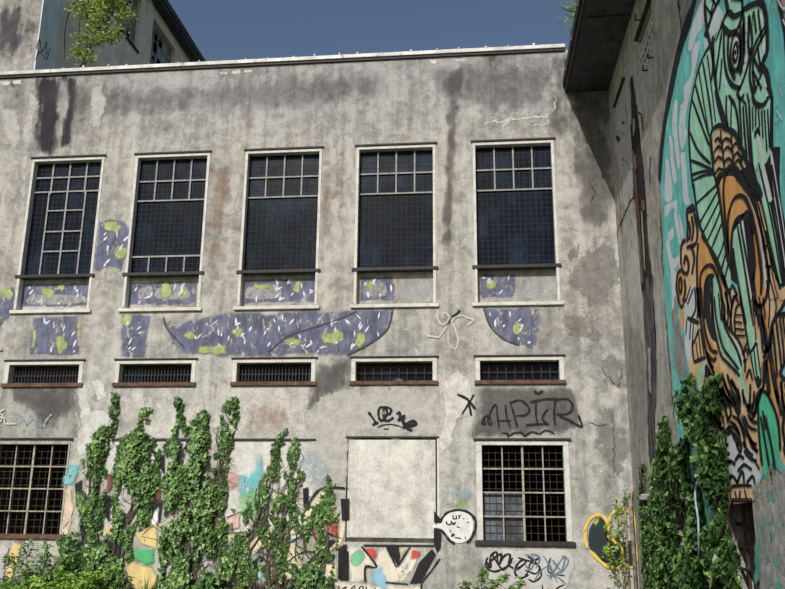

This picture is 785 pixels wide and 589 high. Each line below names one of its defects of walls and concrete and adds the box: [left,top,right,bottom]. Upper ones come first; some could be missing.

water stain [0,7,34,56]
water stain [90,84,106,128]
water stain [448,73,462,159]
crack [484,96,557,131]
water stain [1,77,76,214]
water stain [443,186,451,239]
water stain [13,387,71,420]
peeling [752,466,785,589]